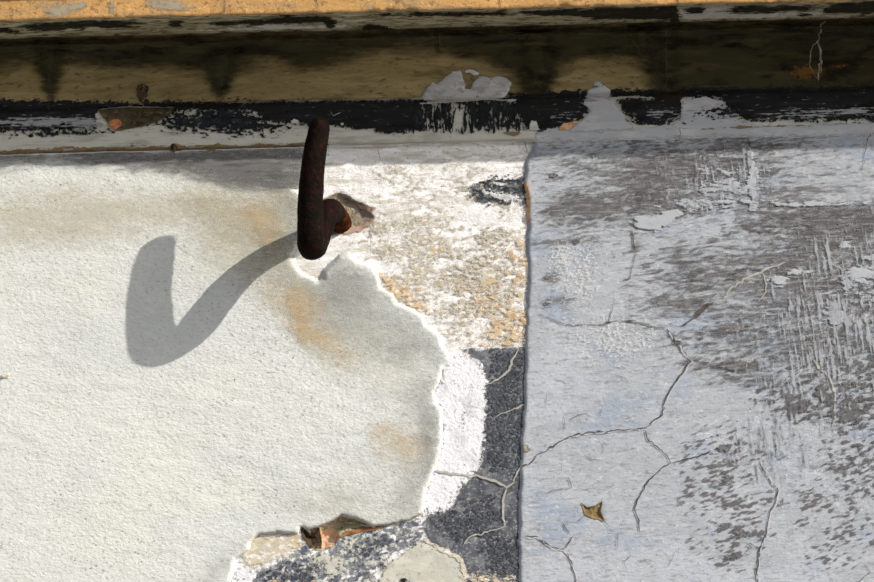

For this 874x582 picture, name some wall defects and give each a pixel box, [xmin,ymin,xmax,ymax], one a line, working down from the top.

damp [794,27,874,83]
crack [746,140,782,232]
peeling [323,83,874,571]
crack [434,262,786,545]
crack [812,358,836,427]
crack [526,524,594,582]
crack [750,439,784,582]